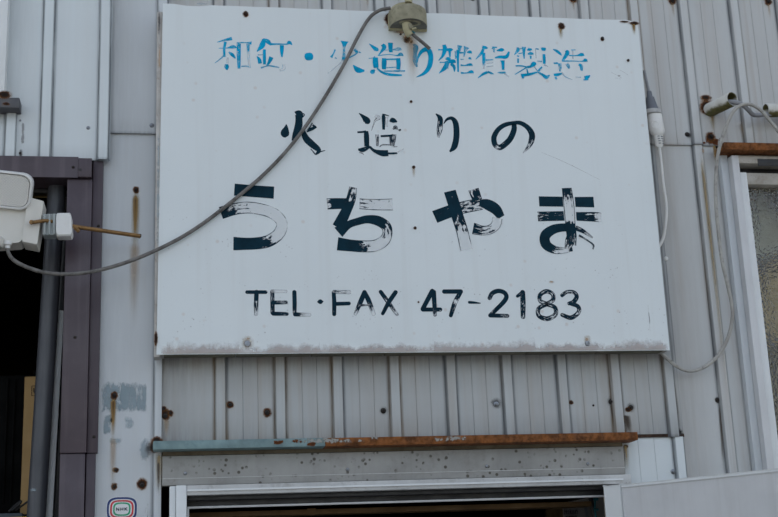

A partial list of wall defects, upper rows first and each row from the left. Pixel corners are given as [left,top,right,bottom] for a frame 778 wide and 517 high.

rust [700,95,714,122]
rust [702,132,720,158]
rust [702,169,717,292]